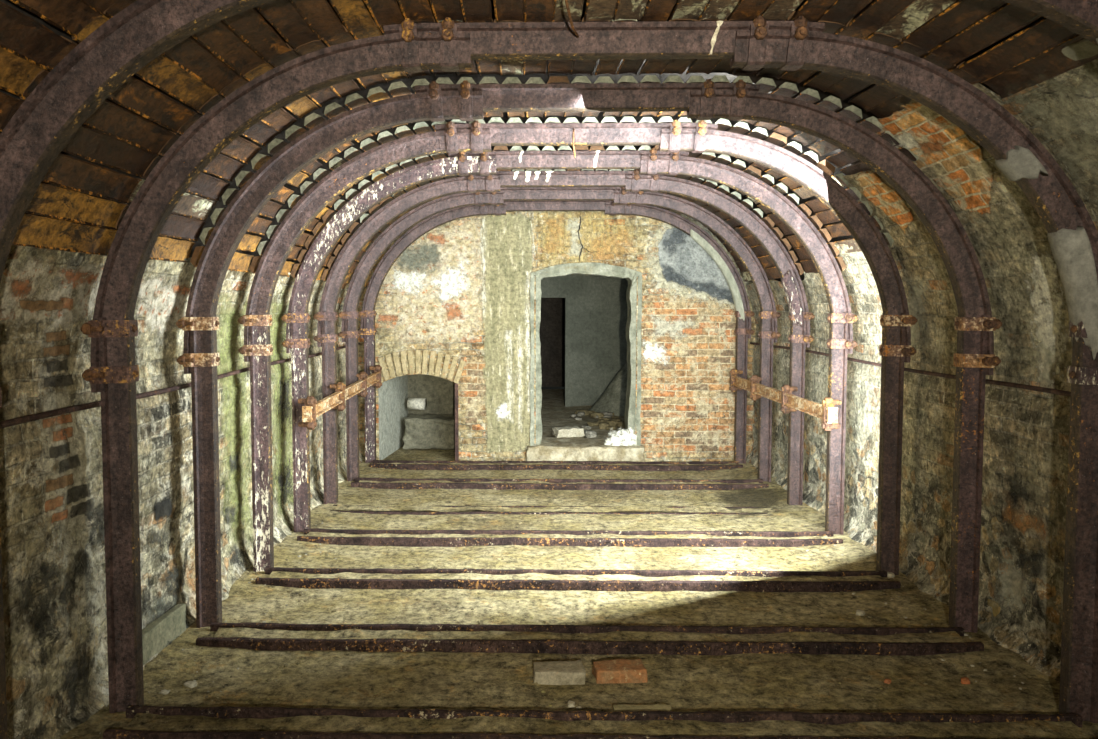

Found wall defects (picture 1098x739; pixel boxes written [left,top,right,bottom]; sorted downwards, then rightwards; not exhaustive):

flaking render [876,102,993,214]
leakage [15,500,109,710]
leakage [26,721,47,739]